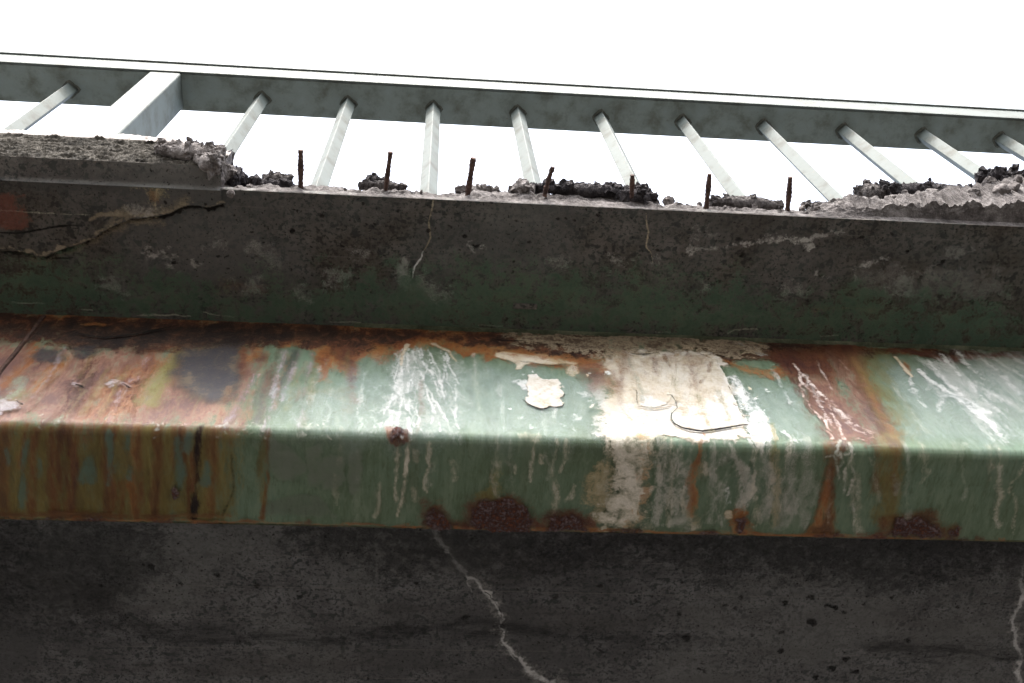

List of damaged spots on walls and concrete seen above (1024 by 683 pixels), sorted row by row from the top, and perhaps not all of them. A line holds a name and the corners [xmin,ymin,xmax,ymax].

crack [0,187,225,265]
crack [410,200,434,278]
spalling [220,149,1024,227]
peeling [0,393,23,415]
corrosion [0,313,610,529]
damp [164,341,1024,604]
peeling [431,342,770,446]
corrosion [531,342,1024,542]
damp [0,438,695,652]
crack [424,529,568,683]
crack [1006,554,1024,683]